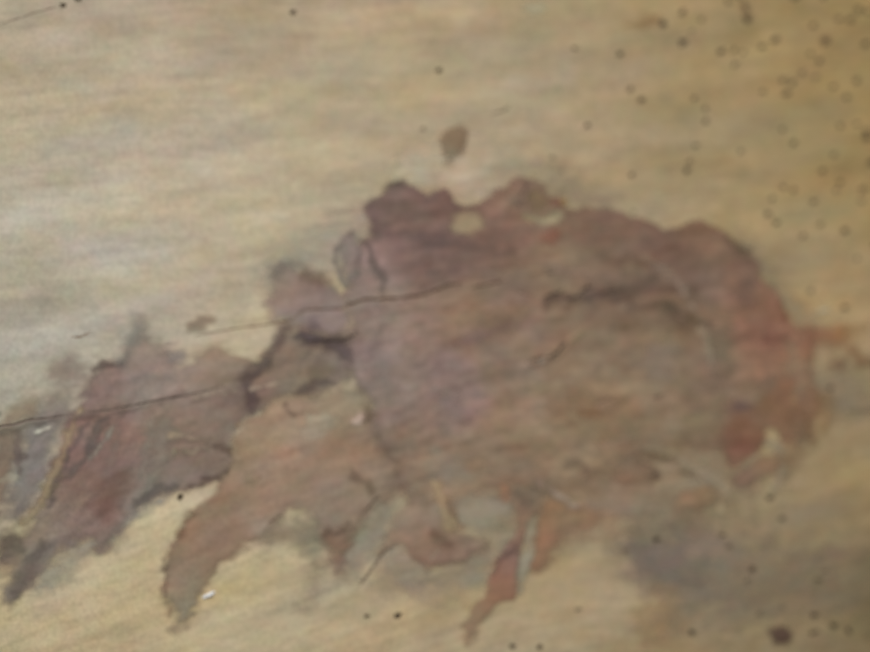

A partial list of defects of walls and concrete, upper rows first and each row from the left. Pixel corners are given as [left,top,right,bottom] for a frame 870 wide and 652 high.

crack [196,271,624,336]
crack [301,331,360,343]
crack [0,385,225,428]
leakage [0,127,821,643]